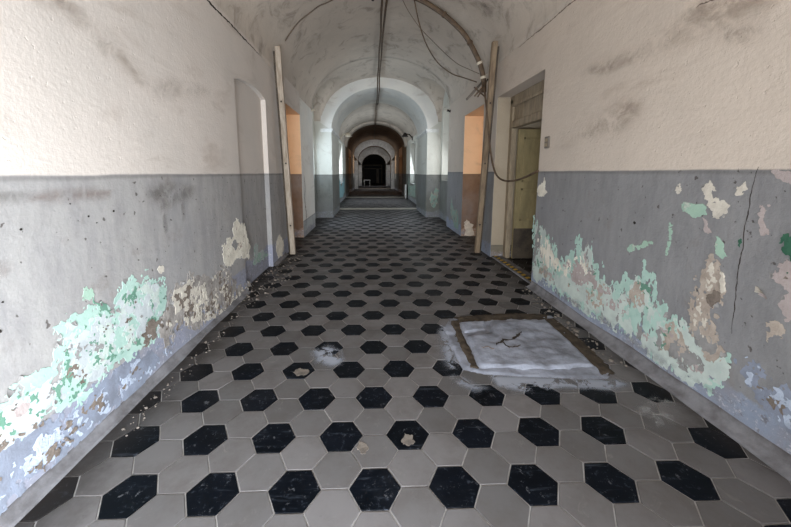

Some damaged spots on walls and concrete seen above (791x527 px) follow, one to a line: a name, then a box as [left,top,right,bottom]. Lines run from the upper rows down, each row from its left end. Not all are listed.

peeling [757,204,771,236]
peeling [0,218,284,452]
peeling [532,177,732,397]
peeling [766,233,791,343]
spalling [35,423,85,472]